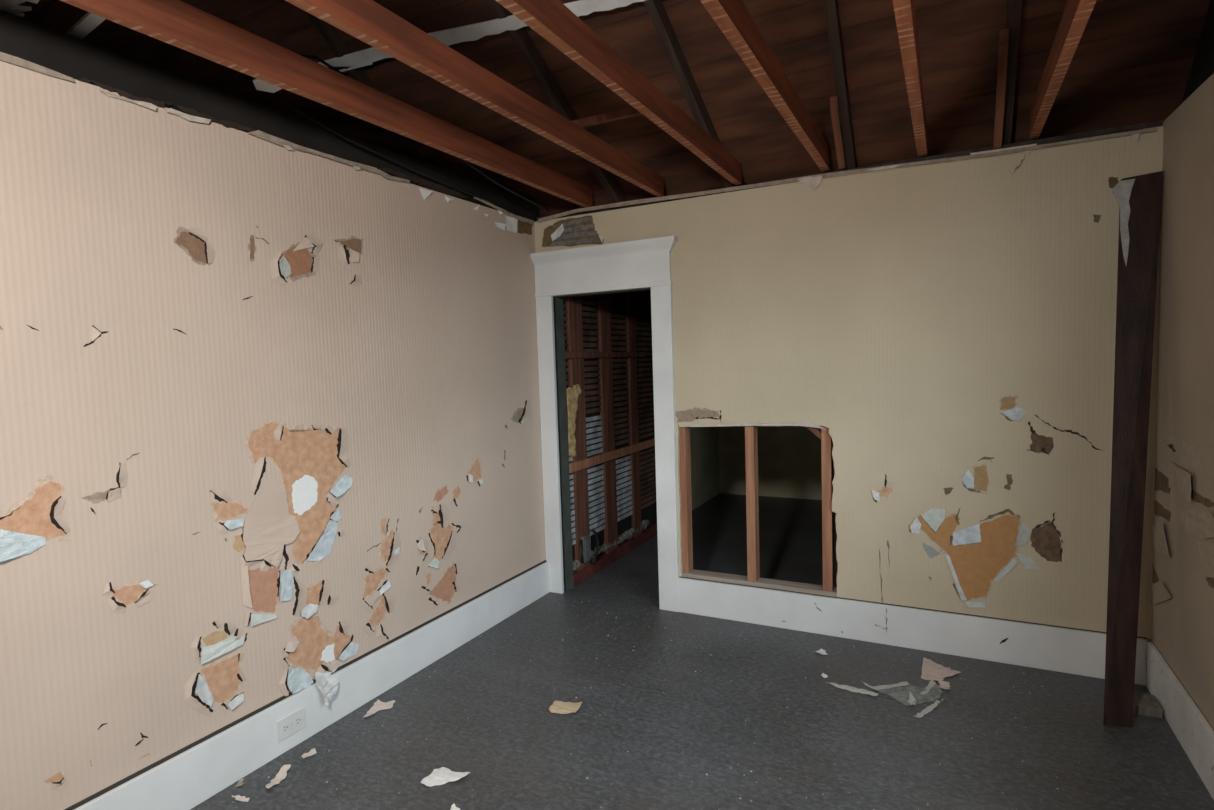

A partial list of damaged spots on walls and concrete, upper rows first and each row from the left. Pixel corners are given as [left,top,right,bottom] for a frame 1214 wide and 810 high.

flaking render [0,52,1156,247]
peeling [174,226,216,266]
peeling [248,226,364,288]
peeling [675,407,722,425]
crack [1034,414,1103,451]
peeling [0,475,72,562]
peeling [102,580,156,613]
peeling [184,420,401,716]
peeling [412,455,483,610]
peeling [909,457,1063,608]